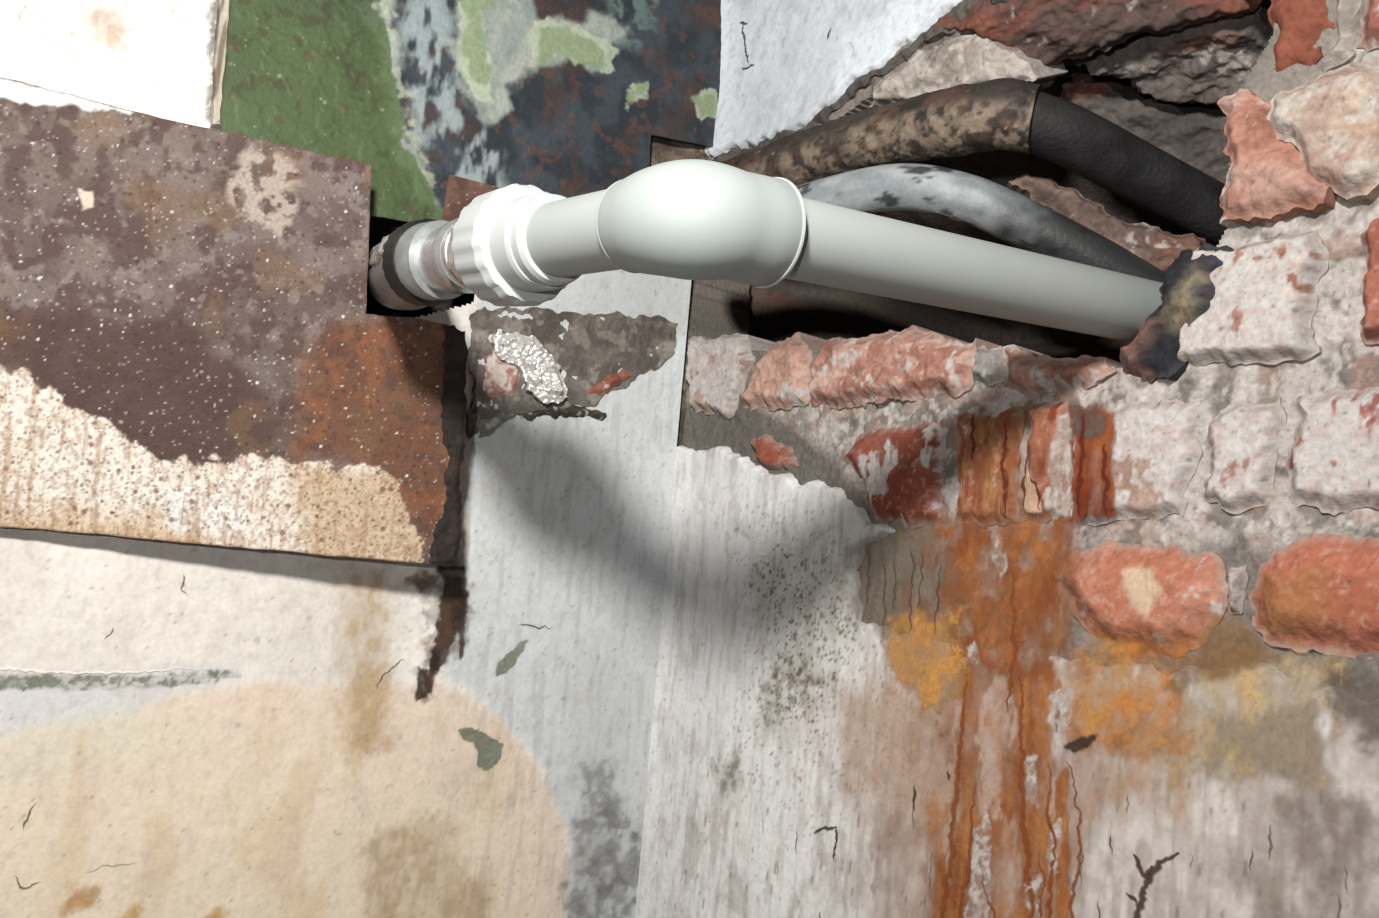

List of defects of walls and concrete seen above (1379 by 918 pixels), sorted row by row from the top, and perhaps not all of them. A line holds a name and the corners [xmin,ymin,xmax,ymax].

flaking render [366,0,1379,699]
corrosion [886,399,1342,918]